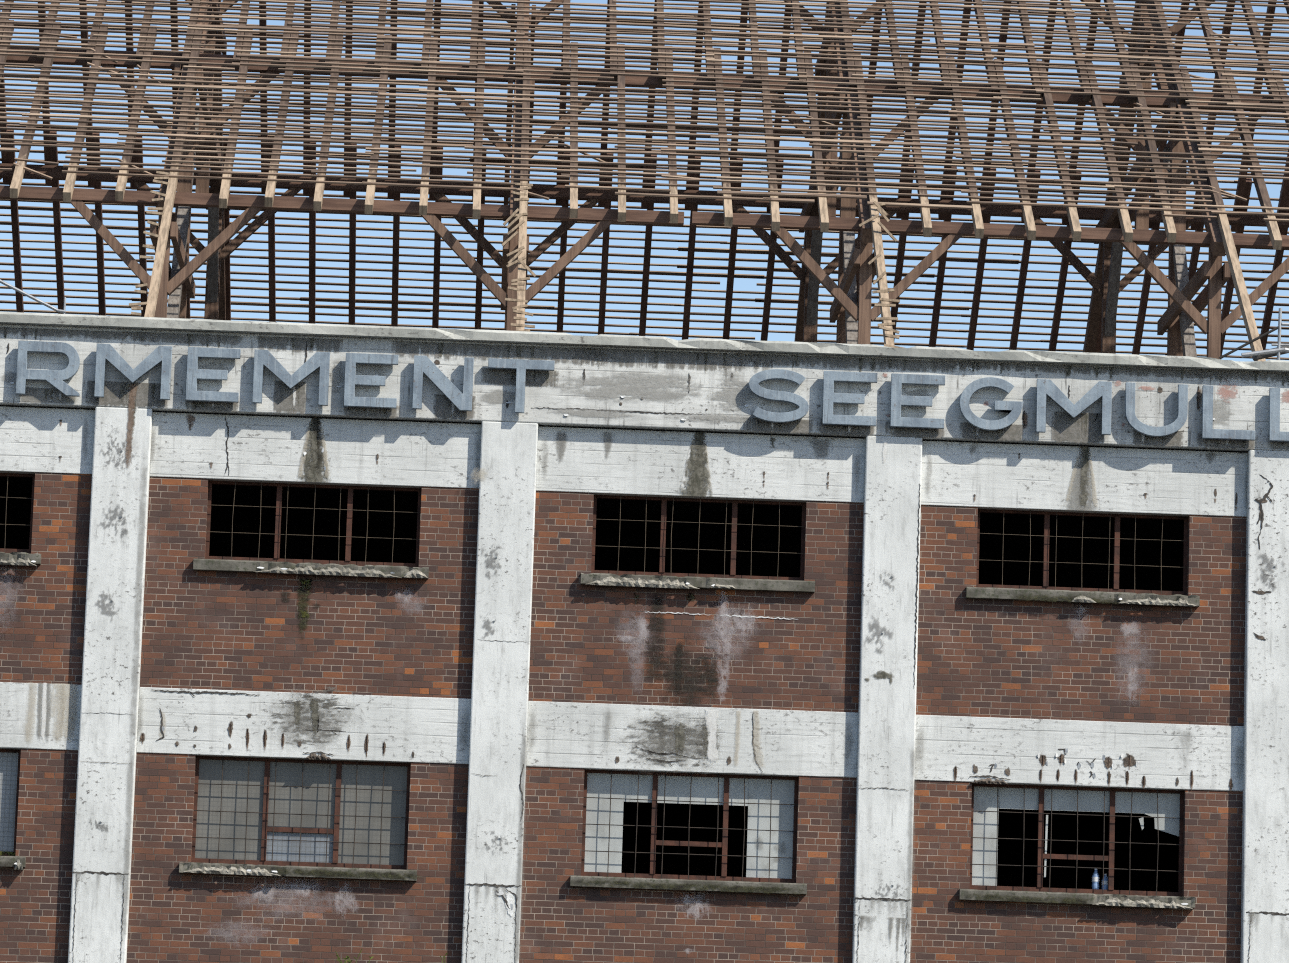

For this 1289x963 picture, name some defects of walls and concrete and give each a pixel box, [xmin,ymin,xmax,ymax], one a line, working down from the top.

leakage [273,381,328,482]
leakage [681,432,712,497]
crack [1255,474,1273,549]
leakage [272,687,348,748]
leakage [625,645,718,771]